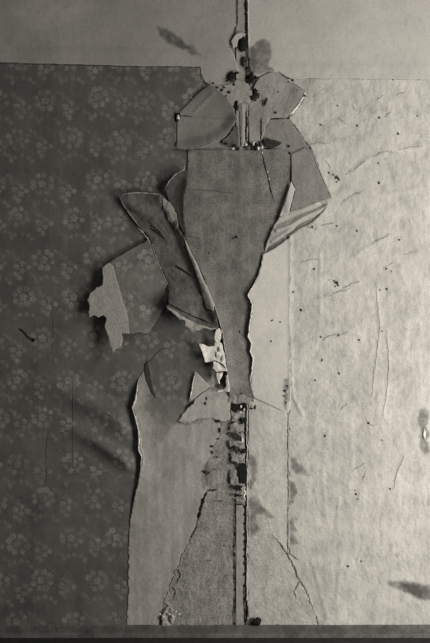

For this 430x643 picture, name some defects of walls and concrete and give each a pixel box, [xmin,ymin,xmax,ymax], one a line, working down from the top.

water stain [161,31,193,53]
spalling [212,32,268,106]
spalling [222,126,291,154]
spalling [159,403,318,626]
crack [273,535,316,613]
water stain [400,582,430,598]